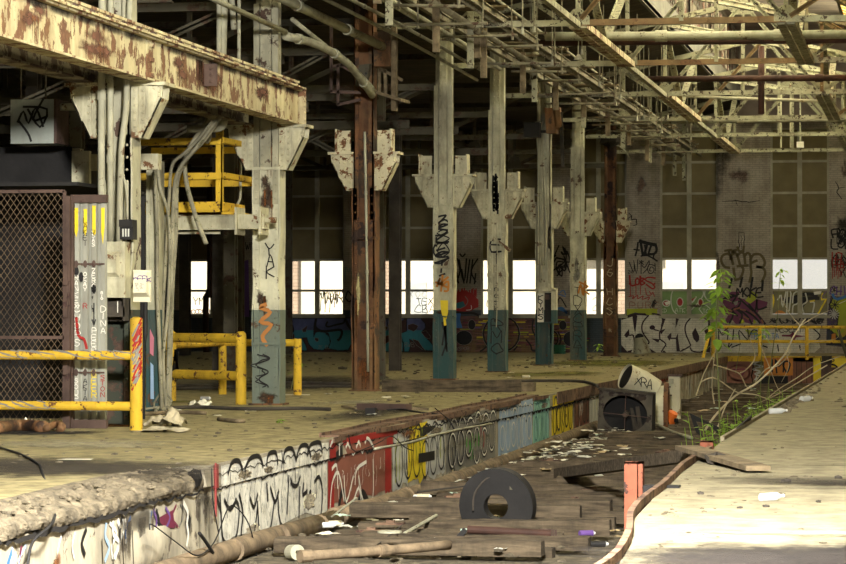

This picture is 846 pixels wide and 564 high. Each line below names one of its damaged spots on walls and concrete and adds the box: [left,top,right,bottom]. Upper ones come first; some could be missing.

rust [196,60,204,83]